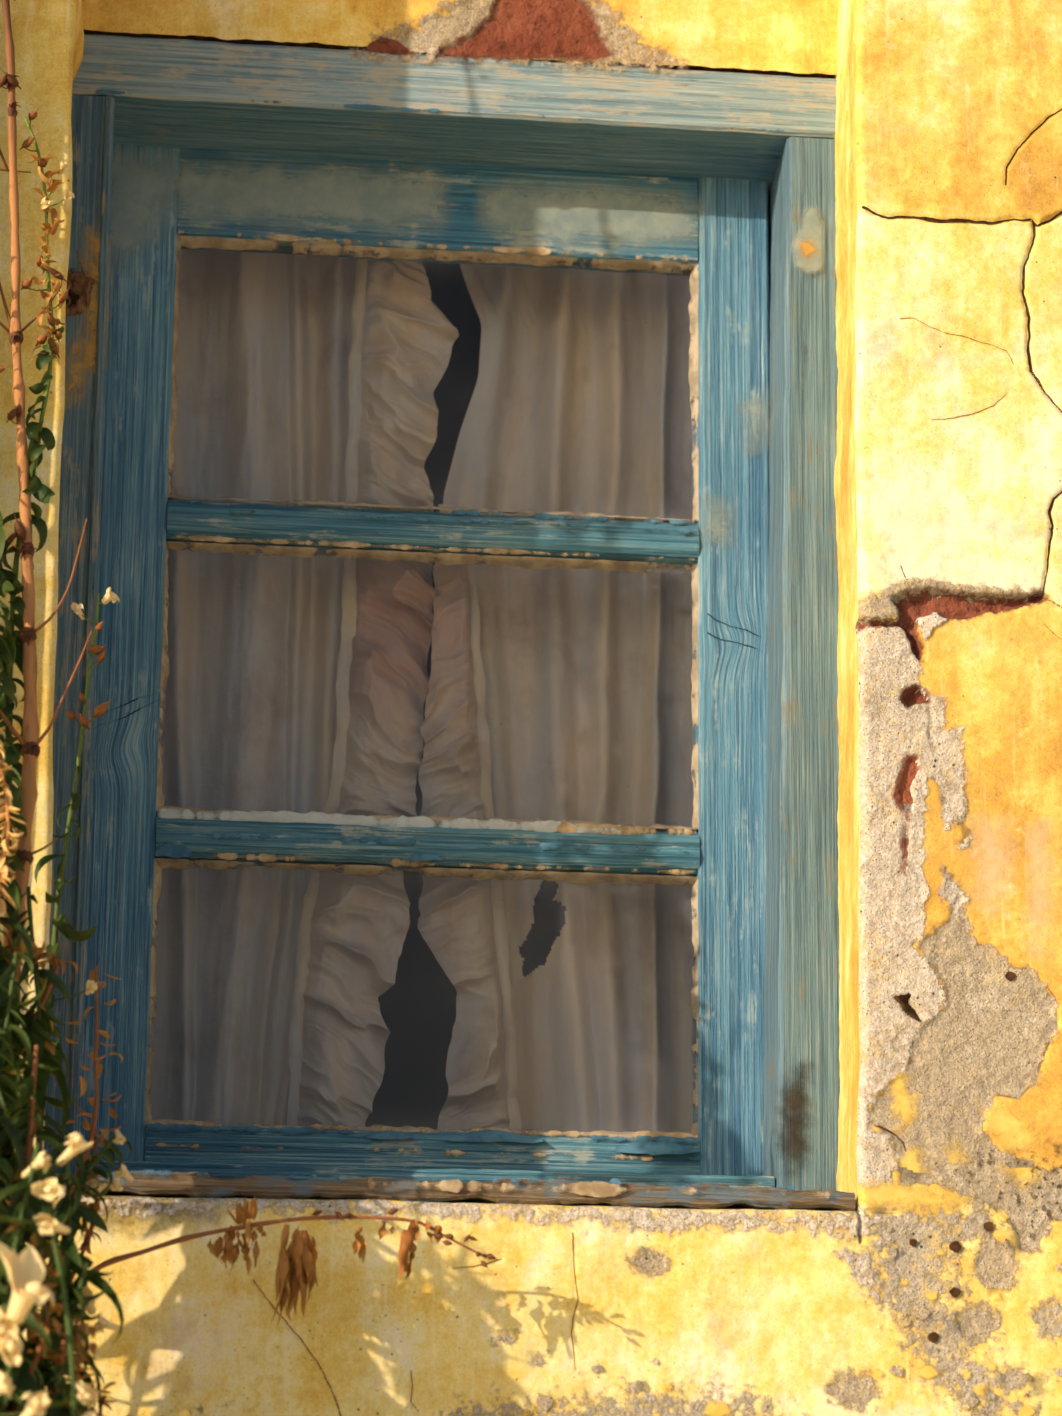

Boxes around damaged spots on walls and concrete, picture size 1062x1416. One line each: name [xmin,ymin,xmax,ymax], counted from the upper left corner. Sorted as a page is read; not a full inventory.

spalling [351,0,688,74]
crack [1005,109,1062,185]
crack [862,206,1062,420]
crack [1042,492,1062,639]
peeling [60,577,1062,1416]